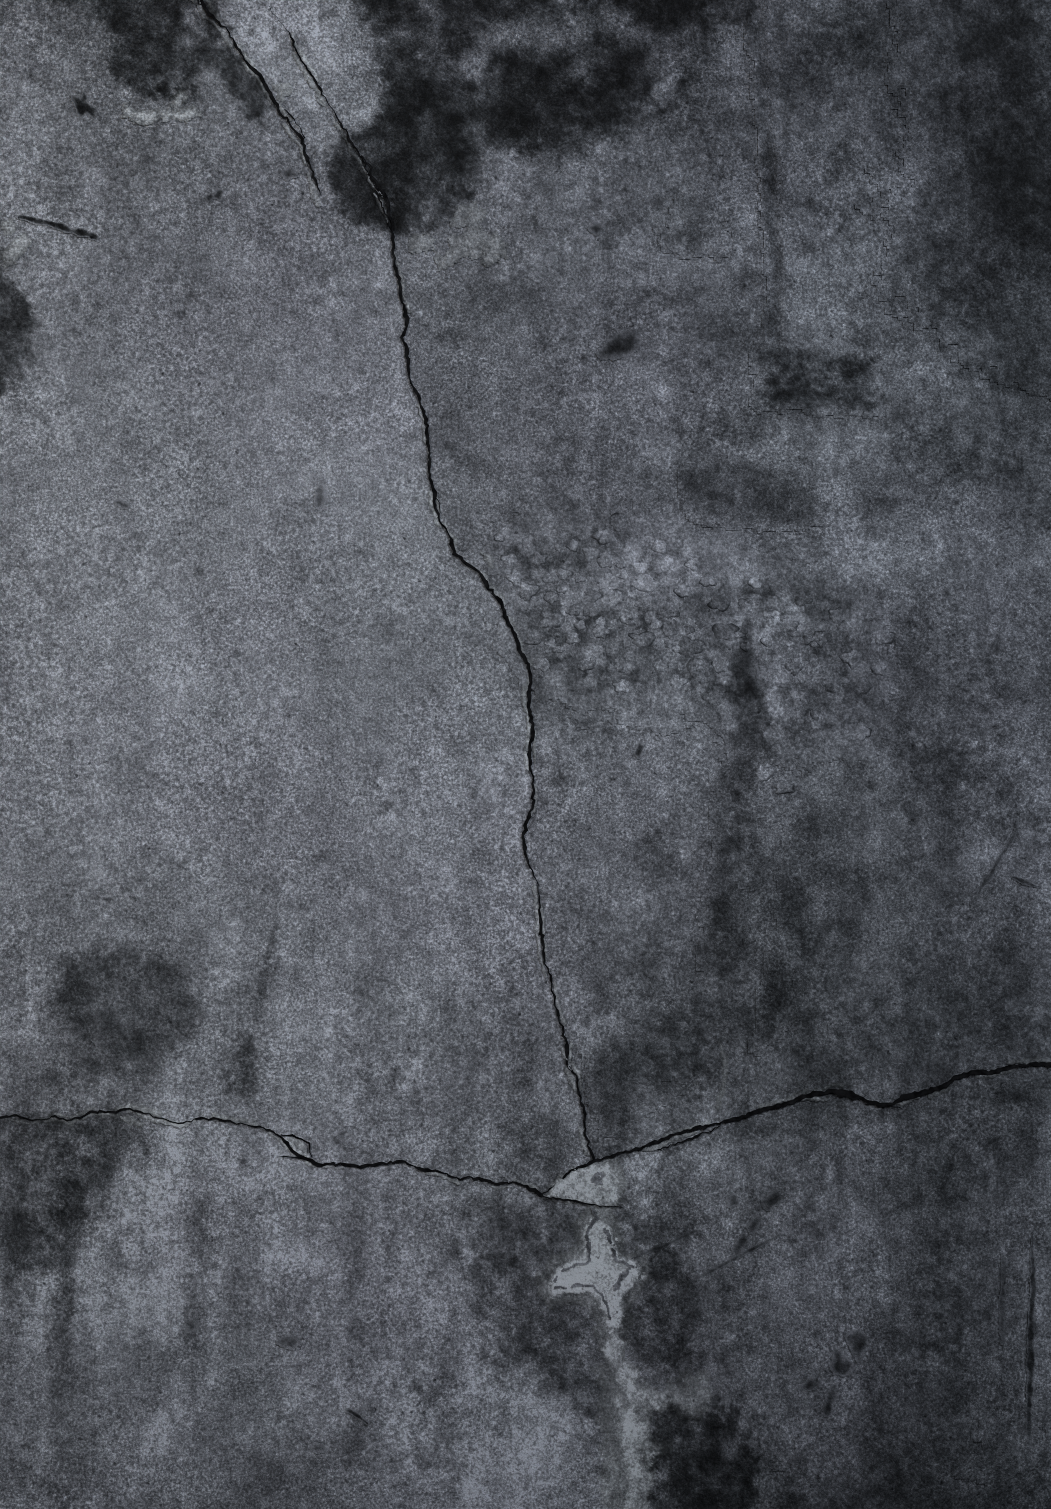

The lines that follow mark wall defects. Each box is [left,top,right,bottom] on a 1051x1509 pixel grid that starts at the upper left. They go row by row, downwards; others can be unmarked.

water stain [315,0,886,419]
crack [0,6,1051,1208]
water stain [436,985,1051,1509]